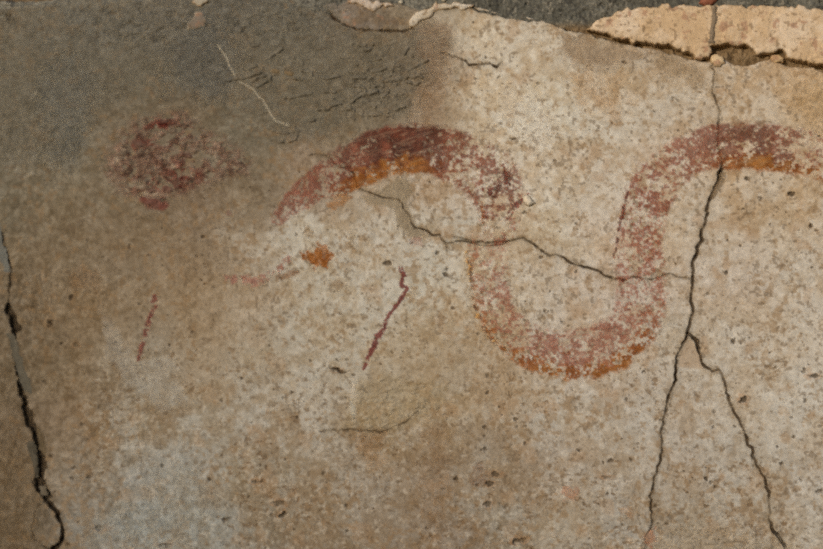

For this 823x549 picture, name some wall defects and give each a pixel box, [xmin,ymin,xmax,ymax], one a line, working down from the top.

spalling [339,0,475,31]
crack [708,5,717,43]
crack [562,257,624,281]
crack [667,163,771,497]
crack [0,228,65,549]
crack [650,421,664,511]